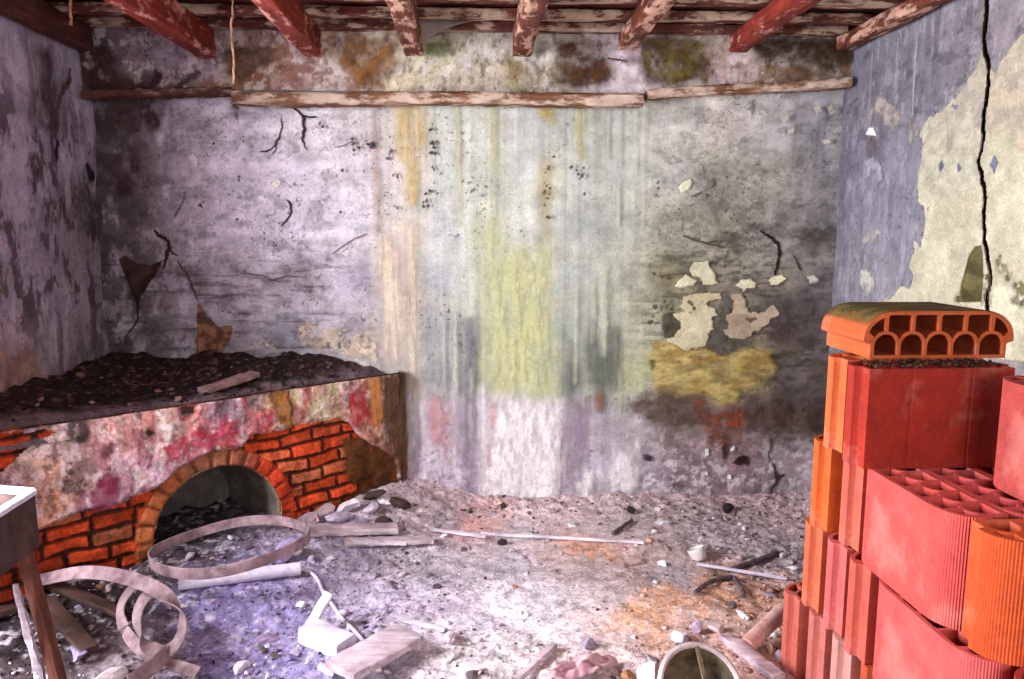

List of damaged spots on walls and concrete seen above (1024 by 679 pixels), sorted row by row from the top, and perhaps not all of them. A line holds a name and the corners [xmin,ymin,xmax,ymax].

damp [554,41,610,88]
damp [640,36,710,85]
crack [281,199,293,226]
crack [260,108,317,155]
crack [760,230,802,287]
peeling [865,34,1024,362]
crack [953,0,1023,311]
peeling [667,261,779,351]
damp [299,228,639,498]
damp [631,295,775,426]
spalling [239,418,359,519]
spalling [34,489,162,582]